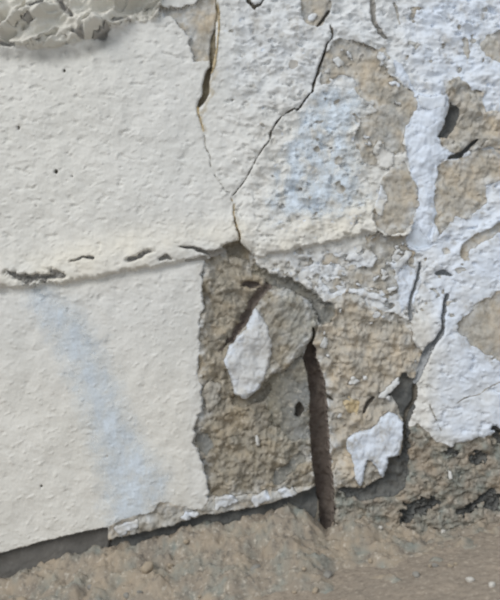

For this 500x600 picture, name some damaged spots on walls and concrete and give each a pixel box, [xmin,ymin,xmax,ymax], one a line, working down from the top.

peeling [160,0,219,62]
peeling [462,30,500,63]
crack [197,0,333,241]
spalling [108,38,500,540]
crack [408,262,453,321]
crack [402,293,449,437]